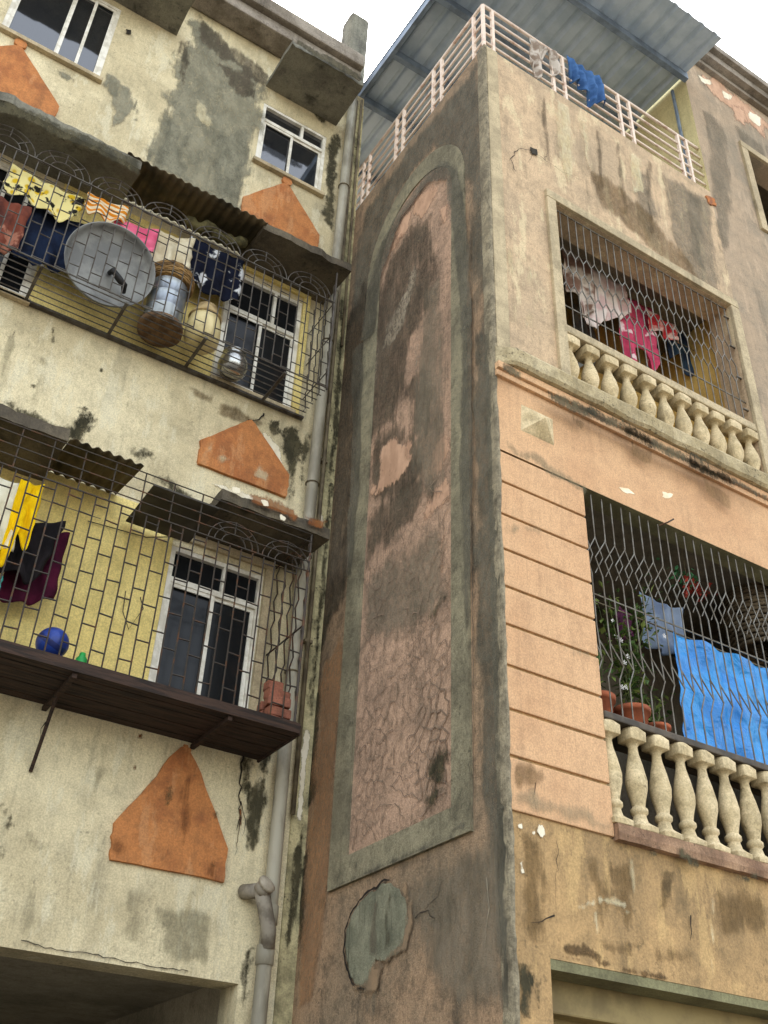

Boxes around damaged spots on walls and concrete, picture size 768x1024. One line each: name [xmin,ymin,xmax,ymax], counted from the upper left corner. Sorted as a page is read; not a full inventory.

damp [0,20,268,209]
peeling [698,74,768,138]
damp [593,113,730,288]
damp [67,407,94,441]
damp [270,420,310,497]
damp [548,391,767,500]
damp [285,64,534,1017]
crack [349,233,474,850]
crack [235,756,246,854]
damp [242,755,271,850]
crack [21,940,188,971]
spalling [343,878,412,992]